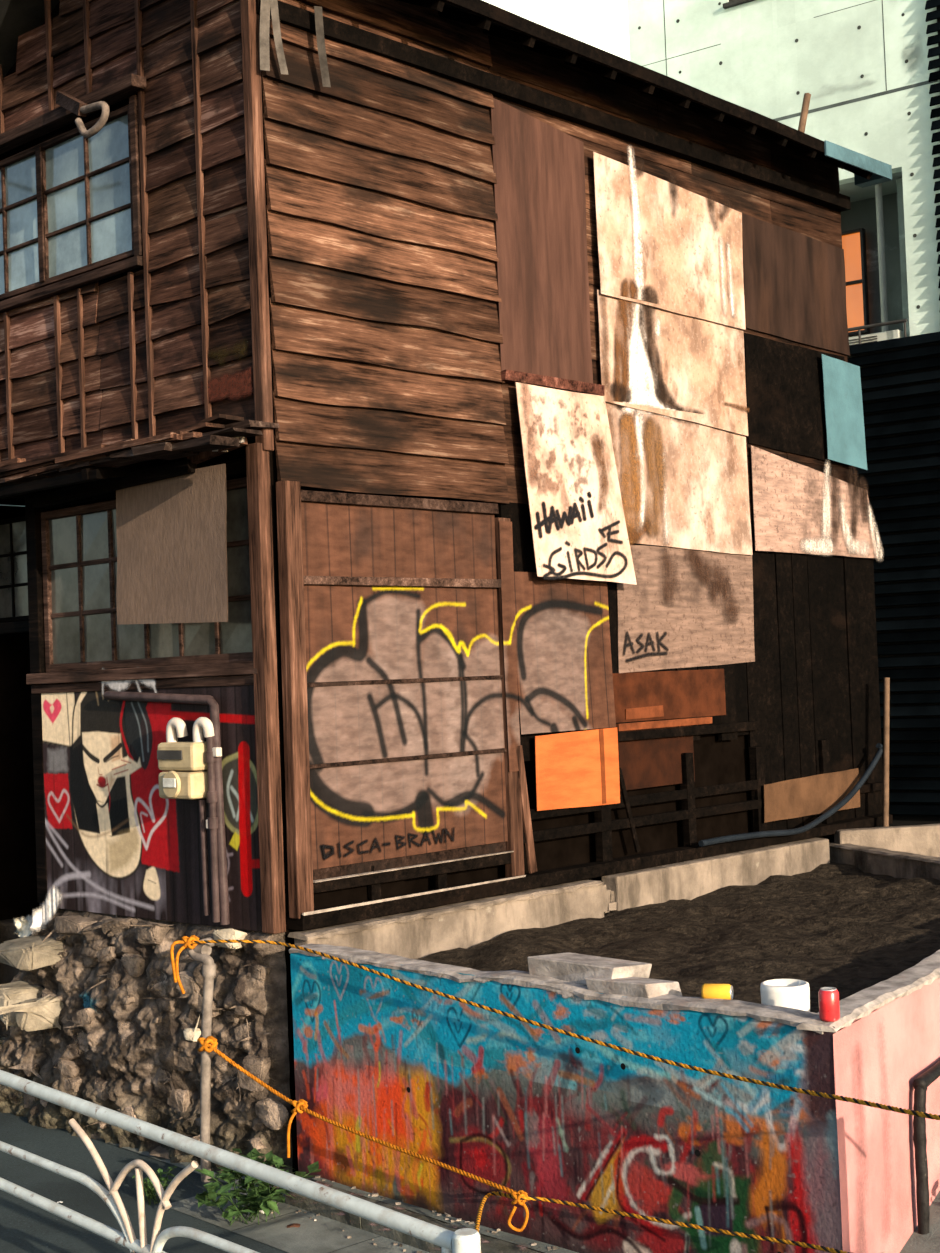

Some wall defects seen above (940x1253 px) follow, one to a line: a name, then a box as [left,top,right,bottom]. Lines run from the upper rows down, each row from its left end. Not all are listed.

damp [708,193,731,228]
damp [720,244,734,316]
damp [623,147,675,532]